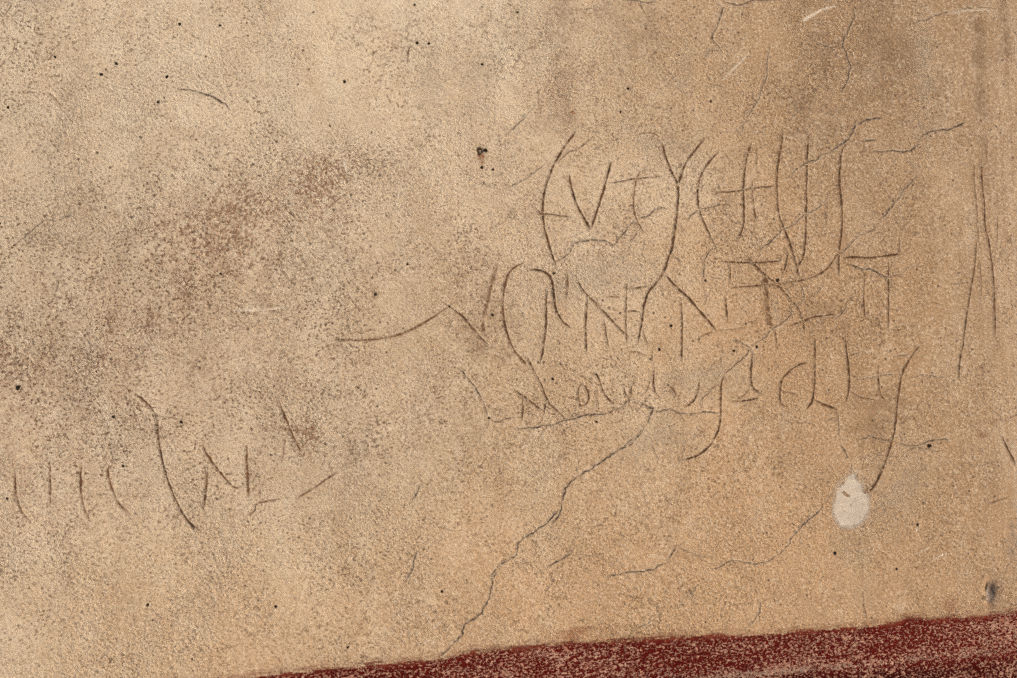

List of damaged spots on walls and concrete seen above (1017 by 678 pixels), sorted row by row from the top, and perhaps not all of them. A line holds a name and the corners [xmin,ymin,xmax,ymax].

crack [702,0,779,60]
crack [814,2,874,92]
crack [914,5,994,24]
crack [733,42,771,137]
crack [508,162,548,189]
crack [788,116,967,279]
crack [558,202,730,261]
crack [701,241,720,305]
crack [439,281,953,658]